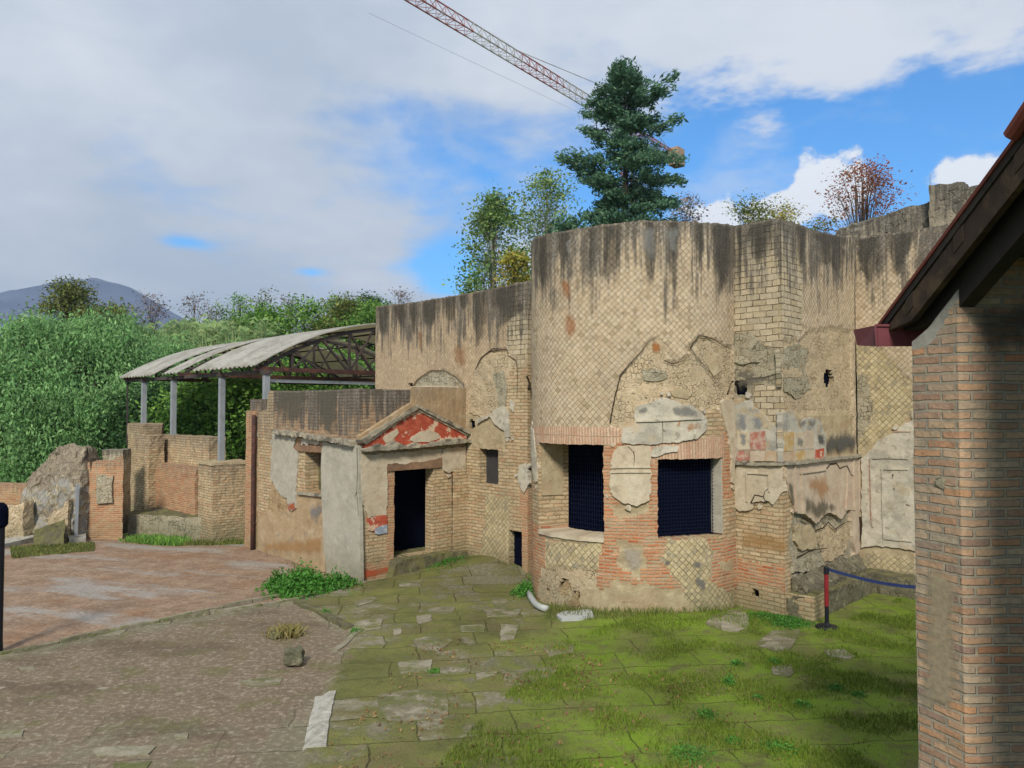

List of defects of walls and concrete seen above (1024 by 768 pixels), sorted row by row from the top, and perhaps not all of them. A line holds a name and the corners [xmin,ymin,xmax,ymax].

flaking render [270,434,322,511]
flaking render [514,422,541,493]
spalling [606,334,915,573]